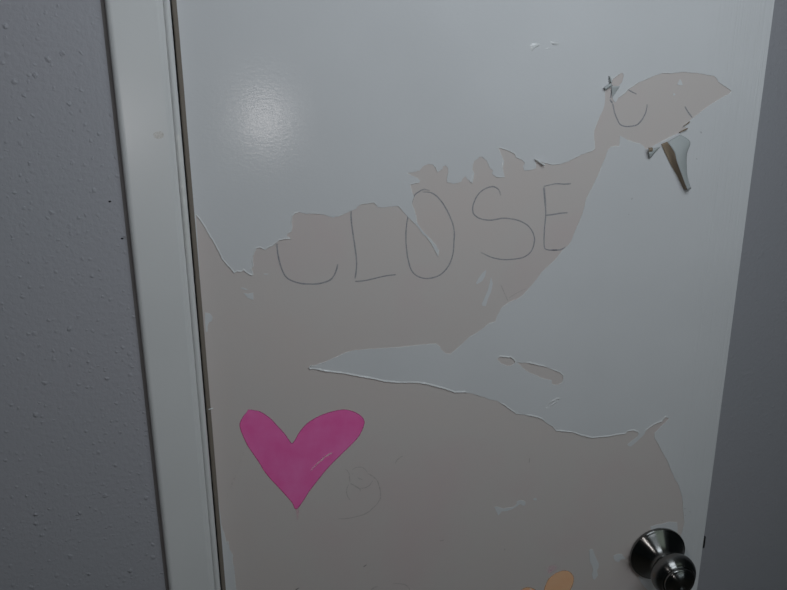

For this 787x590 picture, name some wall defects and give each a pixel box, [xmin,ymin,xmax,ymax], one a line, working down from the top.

peeling [195,72,732,590]